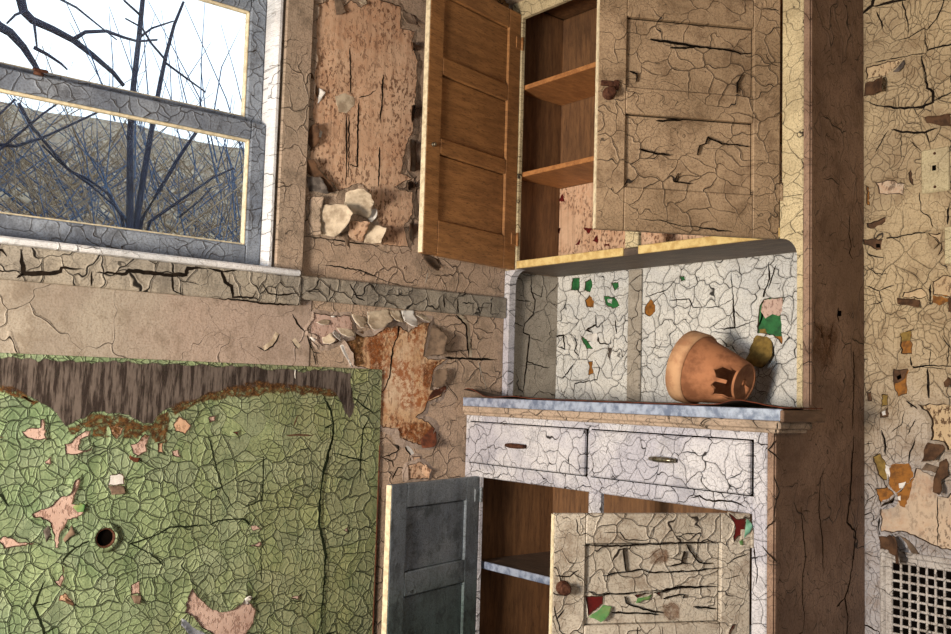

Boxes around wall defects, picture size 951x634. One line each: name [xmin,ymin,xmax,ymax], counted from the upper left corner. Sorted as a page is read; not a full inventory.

peeling [306,0,423,252]
crack [863,0,951,158]
peeling [0,473,88,609]
crack [33,581,57,634]
peeling [18,414,96,468]
peeling [106,413,219,463]
crack [126,437,264,566]
crack [0,249,497,387]
crack [286,393,441,634]
peeling [303,309,448,483]
crack [515,281,617,388]
peeling [864,328,951,565]